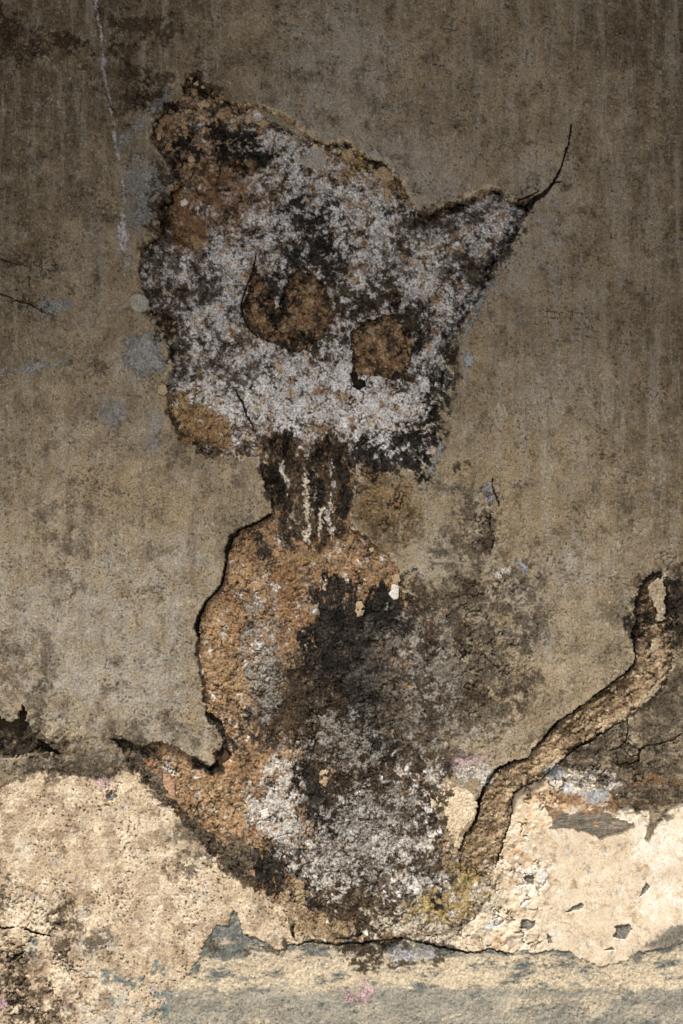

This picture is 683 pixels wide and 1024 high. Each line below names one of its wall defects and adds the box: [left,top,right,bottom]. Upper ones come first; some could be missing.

crack [517,126,571,212]
flaking render [129,72,683,967]
crack [194,513,272,638]
spalling [0,706,57,758]
flaking render [117,739,133,761]
crack [205,710,232,767]
leakage [0,461,554,975]
flaking render [0,766,332,1024]
crack [289,925,506,954]
leakage [0,950,75,1024]